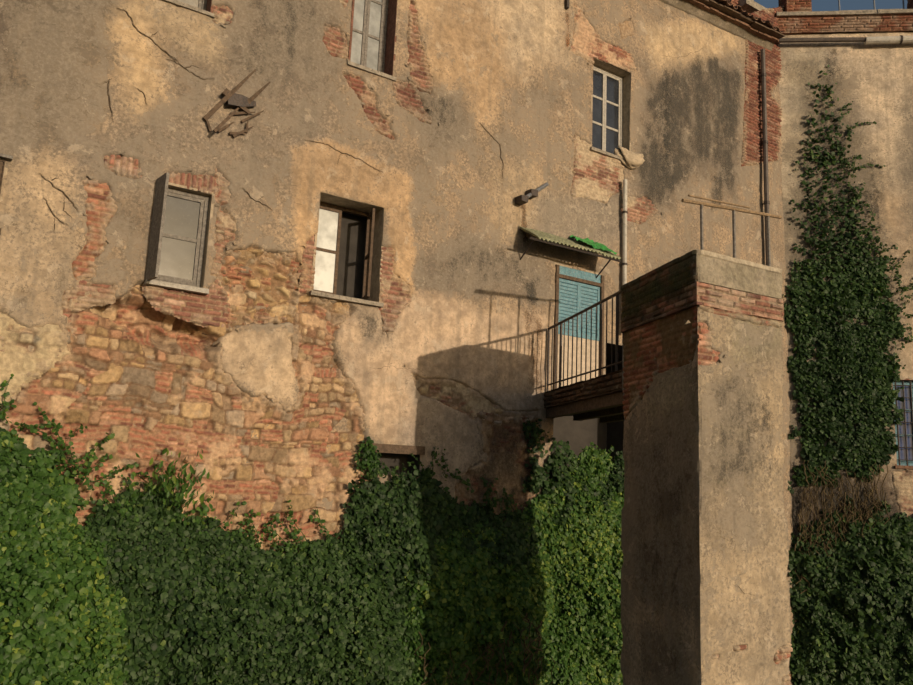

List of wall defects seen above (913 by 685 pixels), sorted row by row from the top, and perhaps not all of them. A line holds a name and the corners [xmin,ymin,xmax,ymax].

crack [118,9,214,80]
flaking render [343,74,394,141]
flaking render [392,0,441,126]
flaking render [569,3,636,72]
flaking render [741,39,782,167]
flaking render [748,6,785,27]
crack [41,175,79,232]
flaking render [570,134,664,224]
flaking render [379,247,412,335]
flaking render [0,167,372,559]
flaking render [622,305,783,419]
flaking render [891,469,913,519]